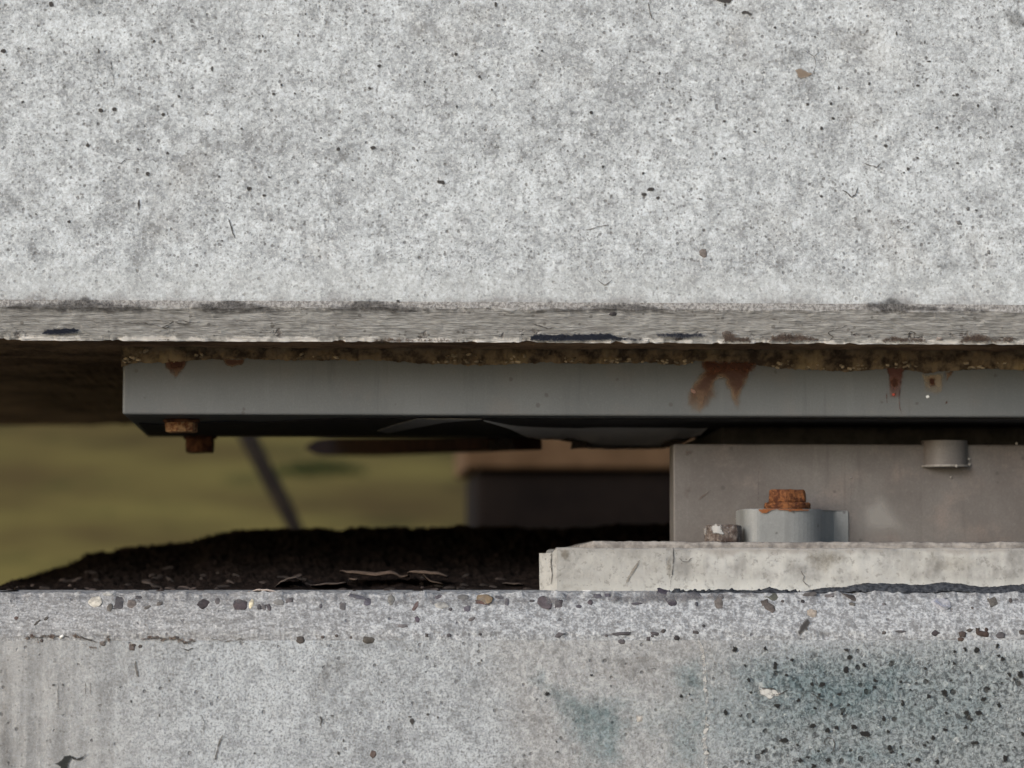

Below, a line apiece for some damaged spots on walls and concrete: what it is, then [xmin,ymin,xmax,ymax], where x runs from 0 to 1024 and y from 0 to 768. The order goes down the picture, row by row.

rust [690,361,754,408]
rust [886,367,904,410]